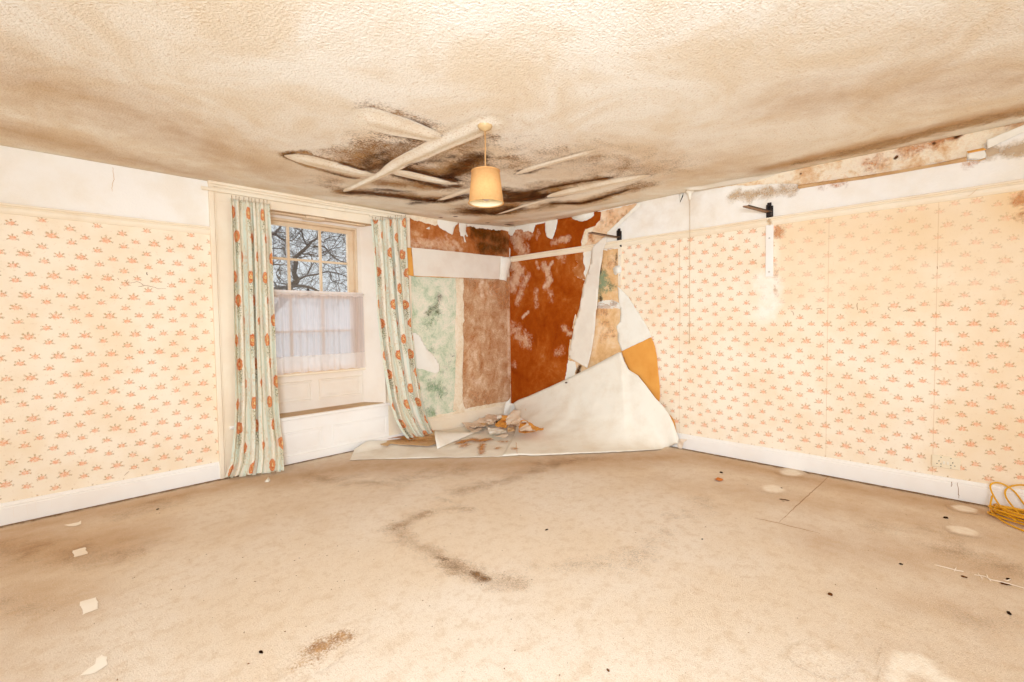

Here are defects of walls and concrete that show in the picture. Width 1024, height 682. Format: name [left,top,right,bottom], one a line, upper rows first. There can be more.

water stain [279,133,658,216]
water stain [730,187,794,199]
flaking render [705,122,1024,190]
water stain [985,143,1024,156]
flaking render [407,203,637,417]